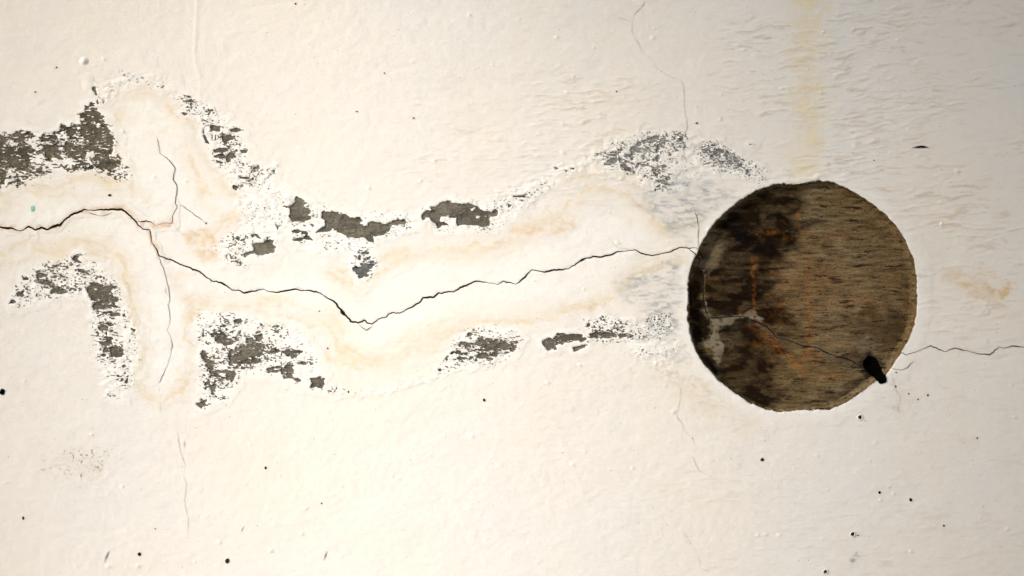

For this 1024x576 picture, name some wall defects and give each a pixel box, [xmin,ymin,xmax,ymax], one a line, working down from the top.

peeling [0,241,147,411]
water stain [0,86,729,413]
peeling [0,64,768,293]
crack [0,1,863,394]
peeling [186,303,684,415]